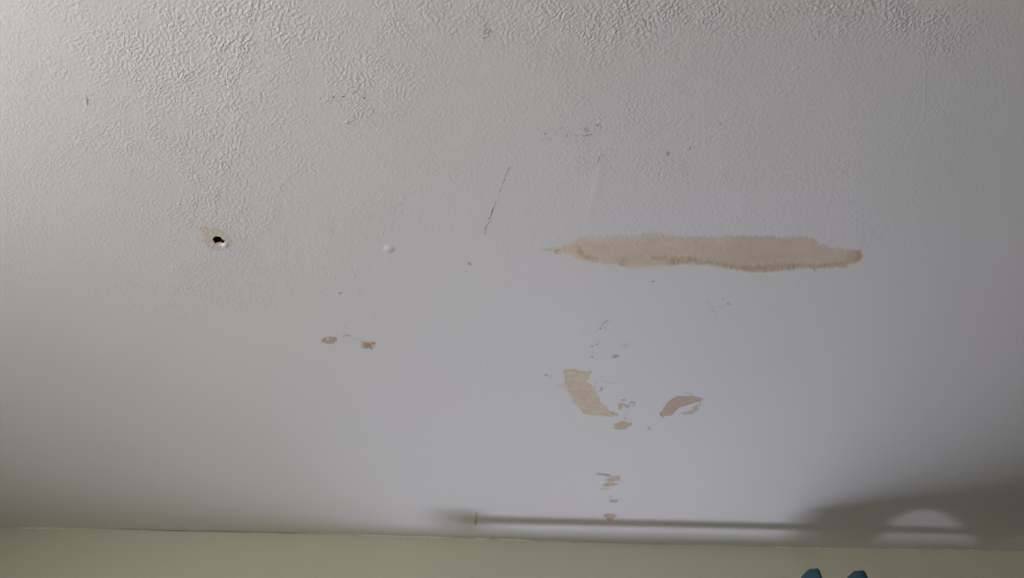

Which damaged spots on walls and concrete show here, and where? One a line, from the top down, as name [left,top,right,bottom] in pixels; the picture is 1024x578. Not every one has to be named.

damp [540,230,864,277]
peeling [554,368,633,430]
peeling [659,391,705,419]